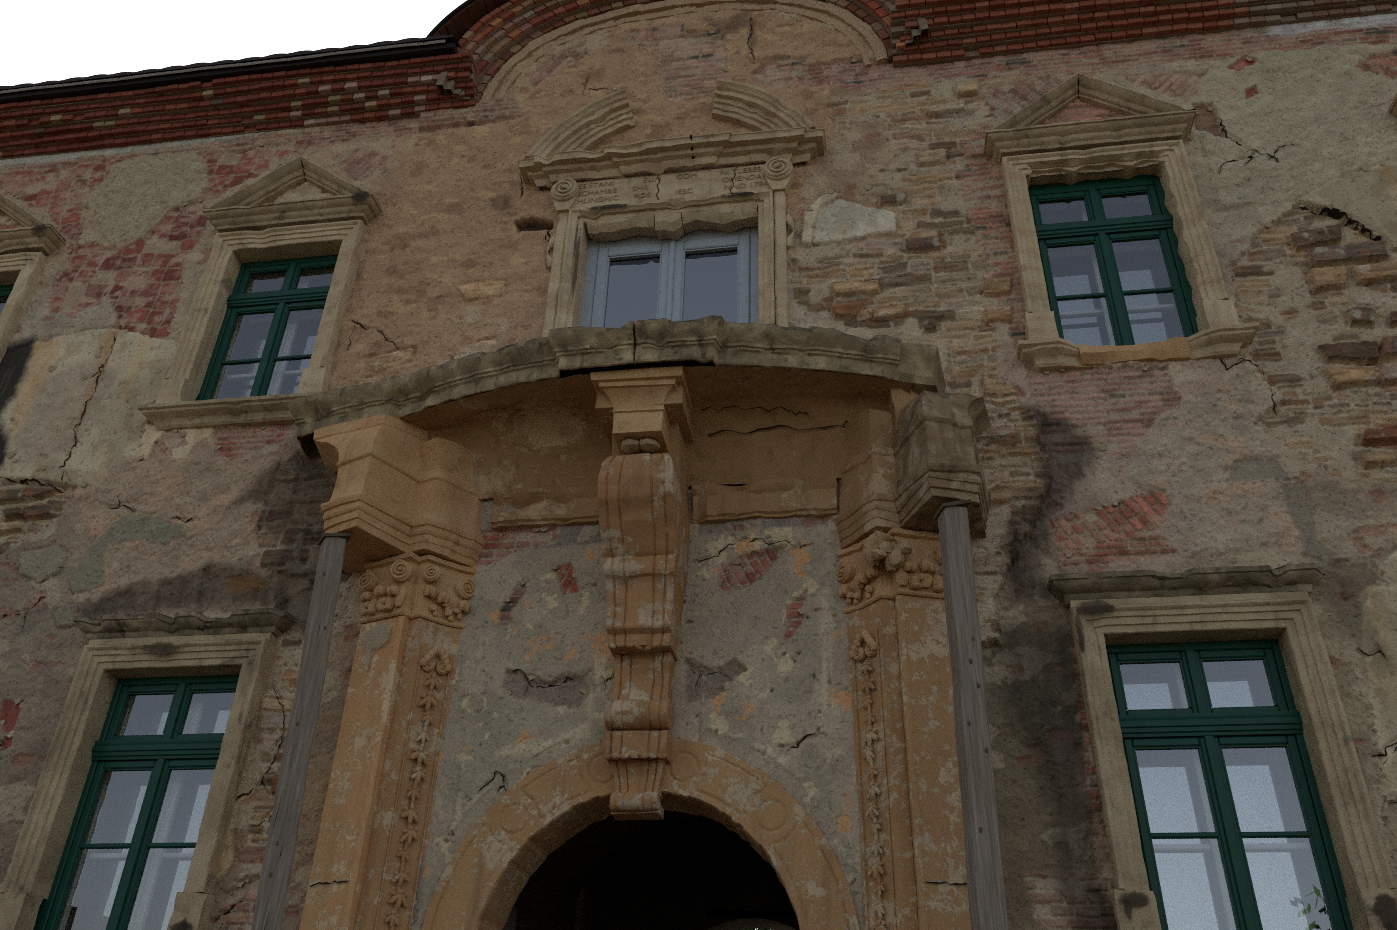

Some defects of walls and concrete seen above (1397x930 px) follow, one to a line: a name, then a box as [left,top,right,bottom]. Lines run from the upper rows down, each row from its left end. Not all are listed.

spalling [826,56,997,91]
crack [1219,118,1295,175]
peeling [1300,161,1397,248]
spalling [0,138,312,488]
crack [347,320,402,350]
crack [0,336,115,493]
crack [702,405,848,436]
spalling [1026,362,1183,460]
spalling [504,668,588,709]
spalling [685,658,748,702]
peeling [1364,552,1397,807]
crack [1371,742,1397,765]